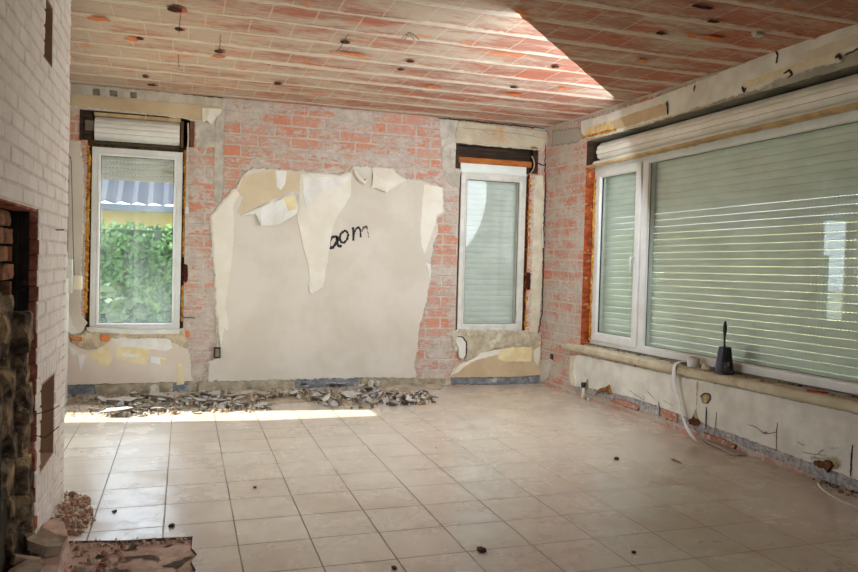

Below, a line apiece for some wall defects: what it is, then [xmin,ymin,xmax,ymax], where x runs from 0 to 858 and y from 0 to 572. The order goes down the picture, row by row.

peeling [581,25,858,139]
peeling [420,184,443,283]
peeling [212,170,350,344]
spalling [69,327,190,371]
spalling [451,329,542,374]
flaking render [661,408,679,423]
crack [748,423,778,451]
crack [847,445,855,477]